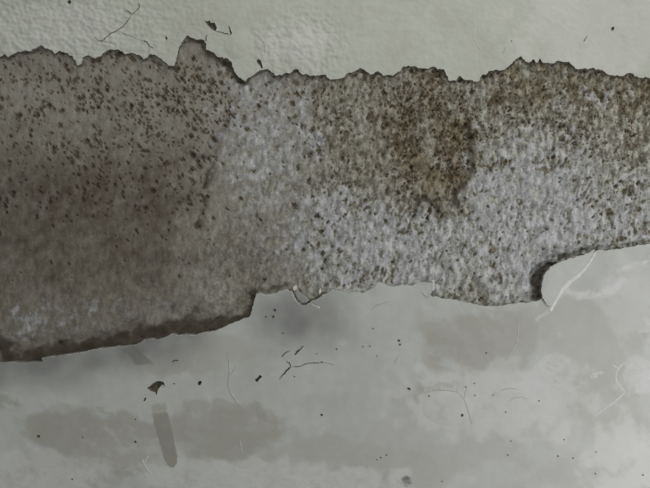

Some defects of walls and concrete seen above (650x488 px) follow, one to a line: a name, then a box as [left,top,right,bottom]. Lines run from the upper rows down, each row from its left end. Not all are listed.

spalling [125,57,239,141]
spalling [325,63,650,198]
water stain [0,37,378,488]
flaking render [534,249,596,312]
crack [279,345,336,380]